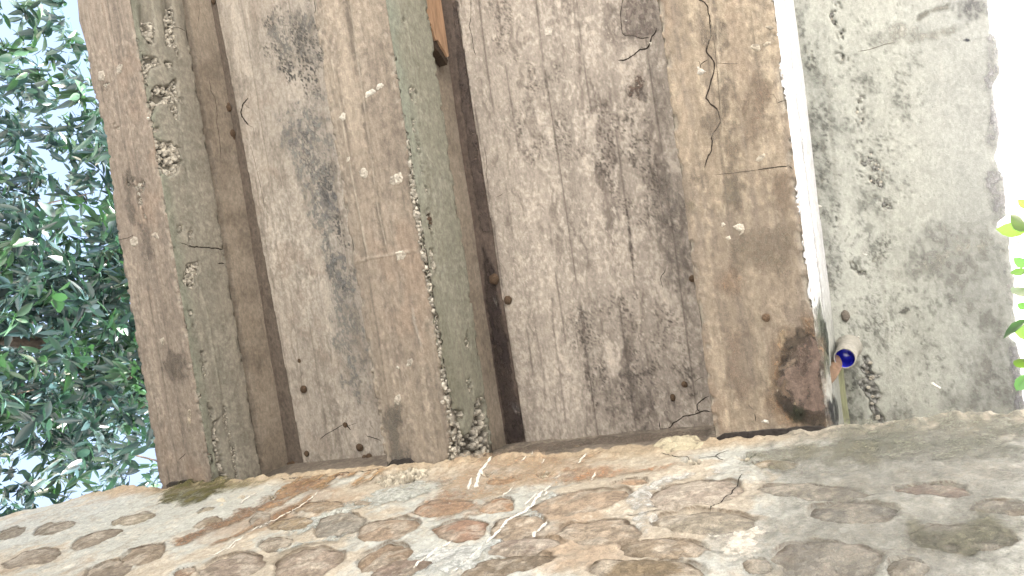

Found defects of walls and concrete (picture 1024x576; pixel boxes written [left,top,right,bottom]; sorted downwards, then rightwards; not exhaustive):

crack [619,0,657,61]
crack [698,0,791,175]
damp [984,33,1003,143]
damp [810,109,831,187]
damp [263,7,369,403]
crack [659,377,742,511]
damp [708,226,1024,576]
damp [277,479,453,551]
damp [413,475,560,575]
damp [627,473,689,528]